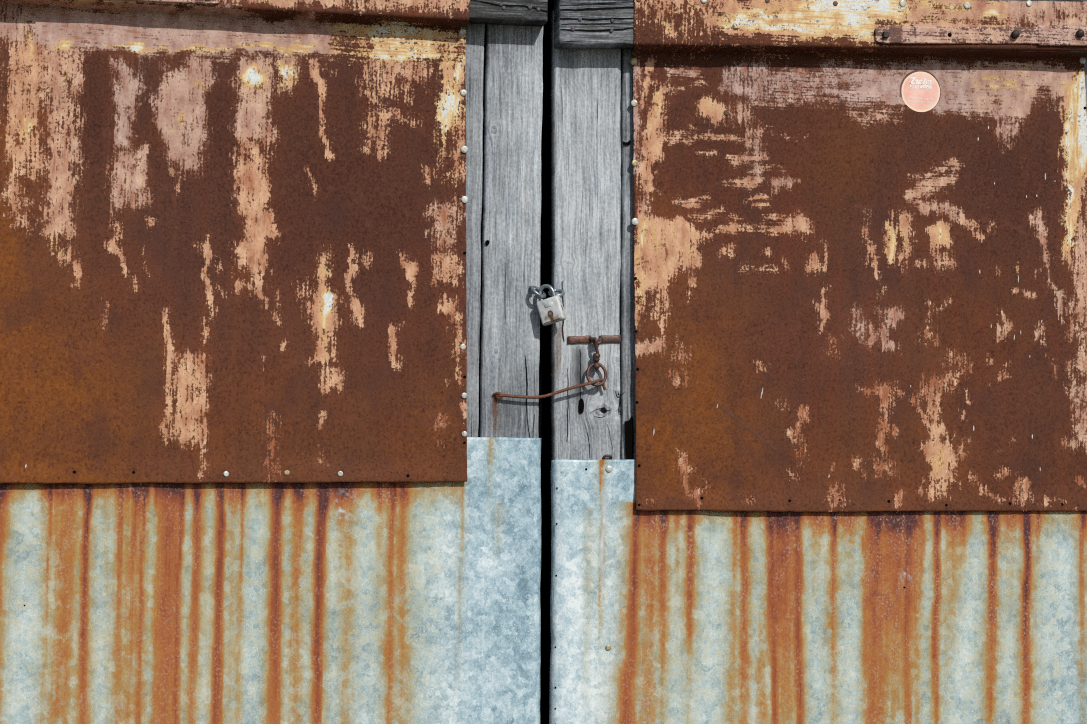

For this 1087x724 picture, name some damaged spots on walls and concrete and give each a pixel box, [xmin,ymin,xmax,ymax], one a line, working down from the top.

corrosion [0,0,470,724]
corrosion [613,0,1087,724]